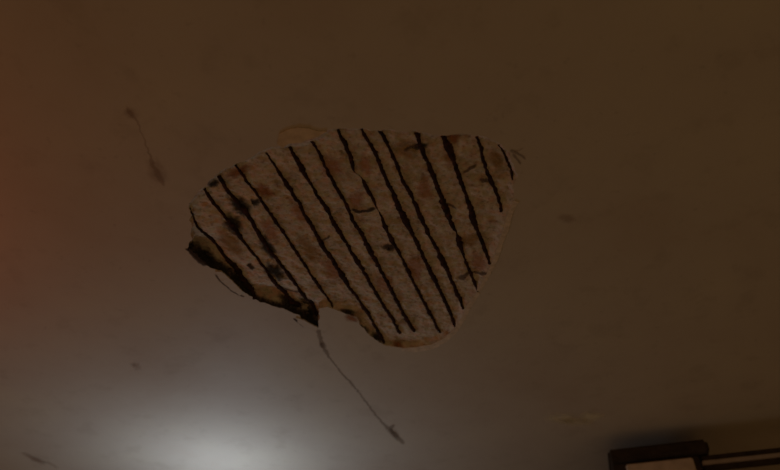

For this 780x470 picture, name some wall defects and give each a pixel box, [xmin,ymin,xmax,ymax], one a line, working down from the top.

spalling [186,127,519,352]